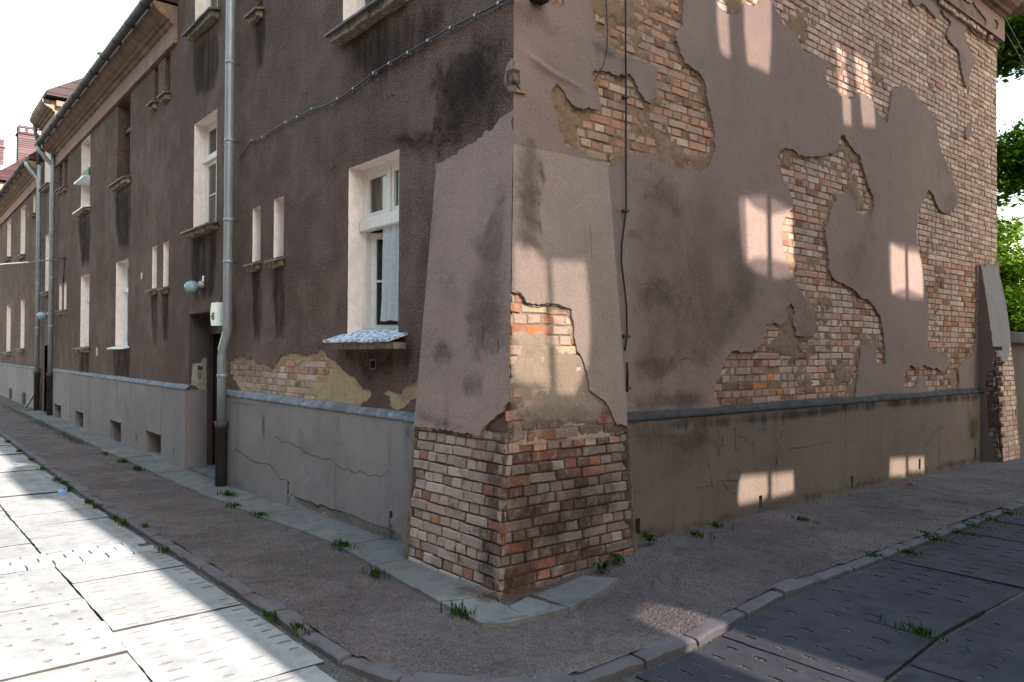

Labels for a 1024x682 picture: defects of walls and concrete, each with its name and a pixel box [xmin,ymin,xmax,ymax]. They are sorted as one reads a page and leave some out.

flaking render [550,0,714,173]
flaking render [714,0,998,406]
flaking render [232,349,371,405]
crack [233,437,396,513]
spalling [288,272,633,599]
spalling [986,343,1021,462]